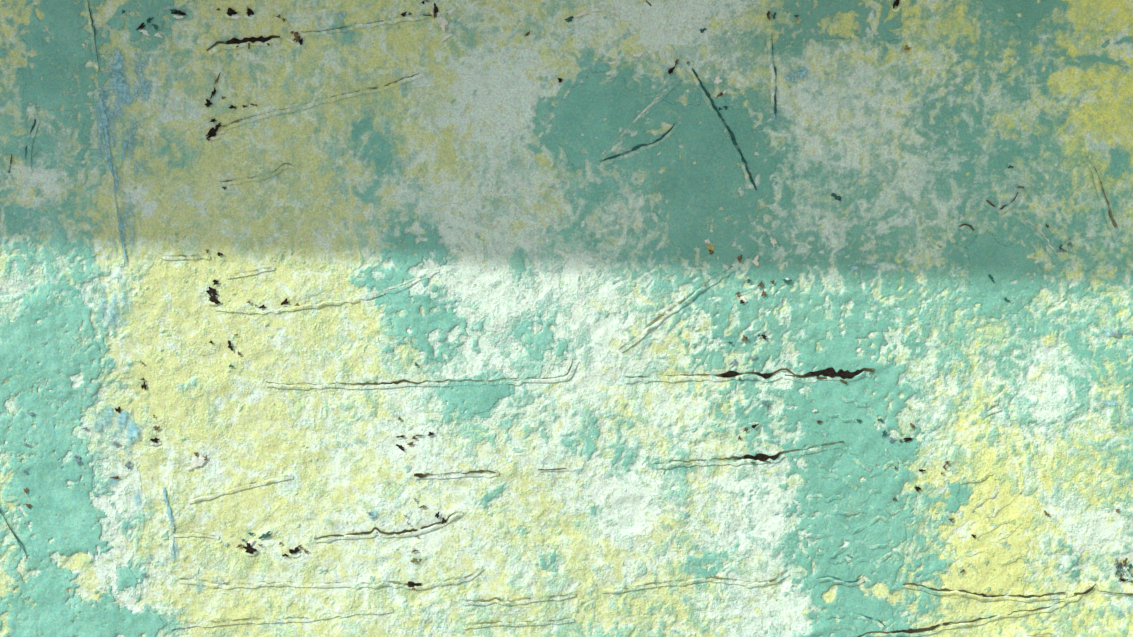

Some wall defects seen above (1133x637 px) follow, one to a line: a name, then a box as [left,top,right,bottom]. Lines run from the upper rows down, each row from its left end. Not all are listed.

peeling [1101,36,1133,47]
crack [600,121,683,167]
crack [265,359,579,390]
crack [624,367,875,384]
crack [654,441,844,469]
crack [414,470,499,480]
crack [314,511,463,543]
crack [170,555,1133,637]